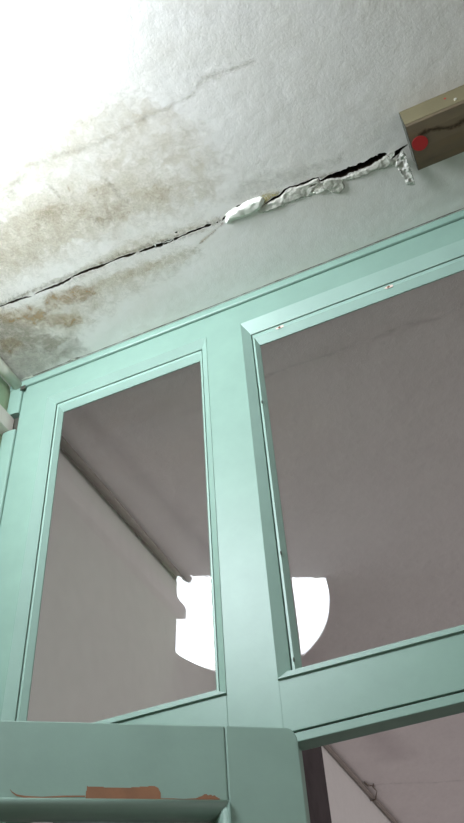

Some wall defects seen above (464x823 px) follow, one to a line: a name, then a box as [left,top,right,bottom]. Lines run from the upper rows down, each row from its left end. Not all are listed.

crack [261,144,408,207]
flaking render [258,151,415,213]
crack [0,204,241,307]
crack [33,208,463,376]